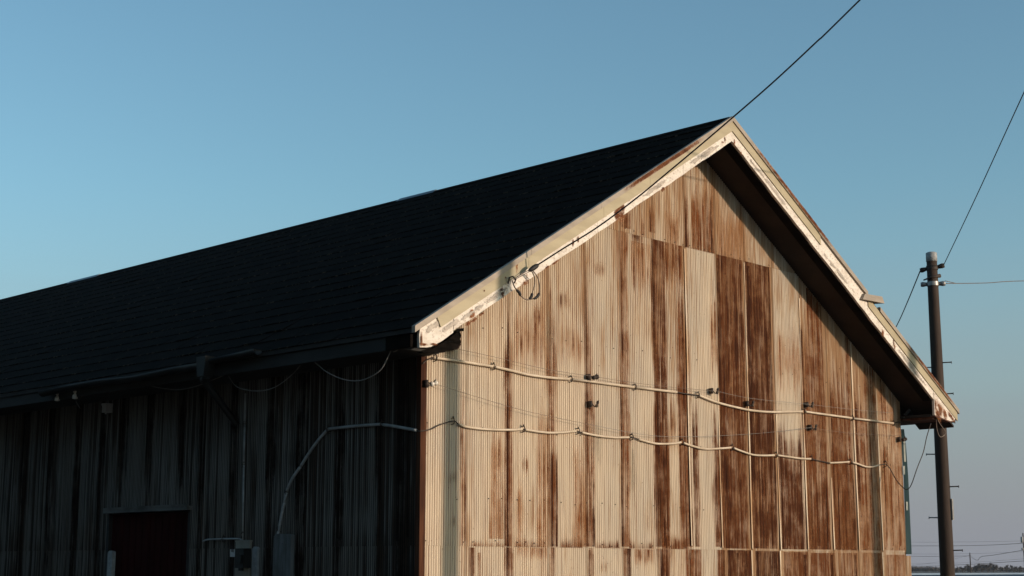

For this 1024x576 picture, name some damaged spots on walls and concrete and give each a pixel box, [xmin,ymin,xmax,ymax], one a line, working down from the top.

peeling [750,158,787,208]
rust [461,194,905,576]